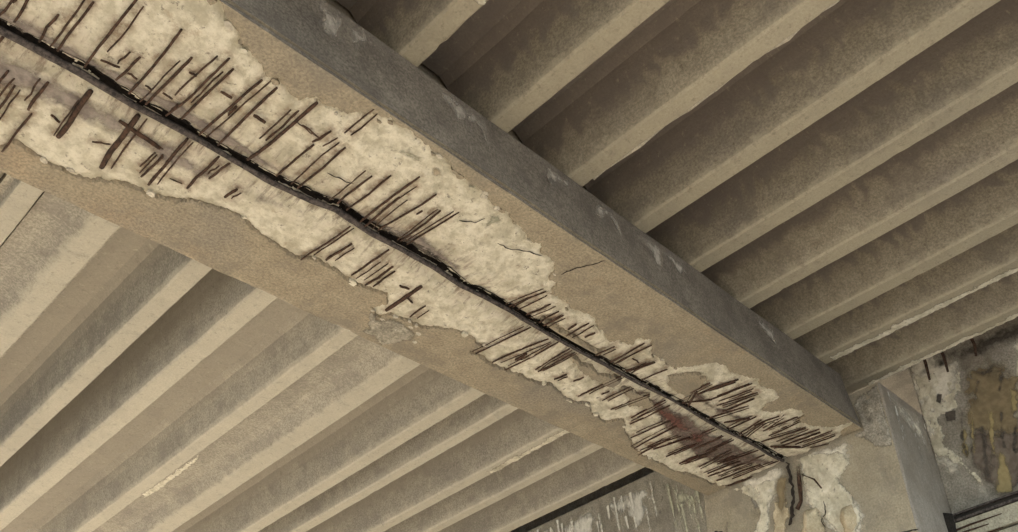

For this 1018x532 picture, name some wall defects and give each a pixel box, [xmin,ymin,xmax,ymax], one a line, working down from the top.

rust [0,10,270,176]
crack [0,18,795,526]
rust [373,221,458,269]
spalling [0,0,853,486]
rust [638,392,769,466]
peeling [734,480,790,532]
rust [775,477,787,511]
peeling [800,451,862,532]
peeling [866,313,1018,484]
damp [887,326,1018,493]